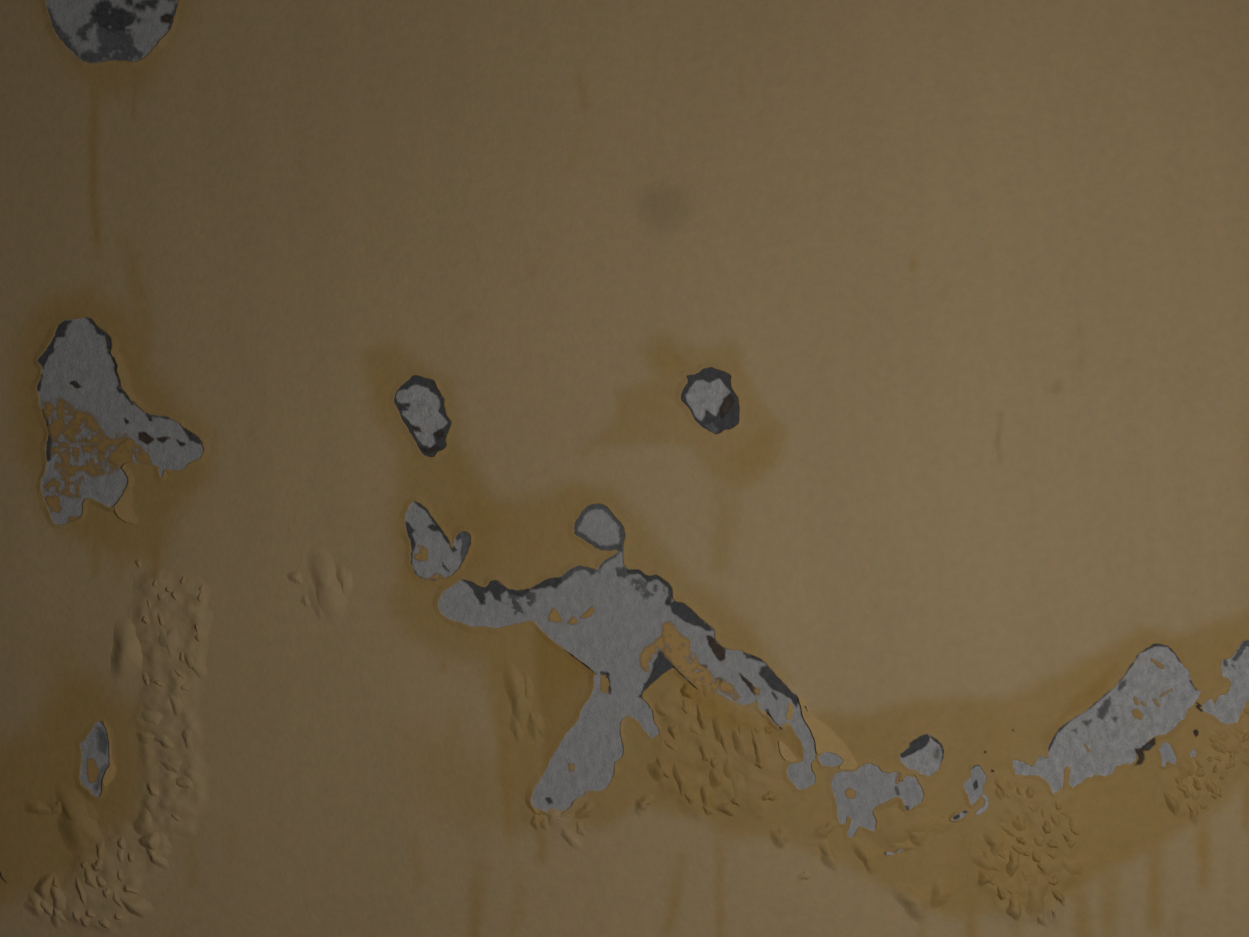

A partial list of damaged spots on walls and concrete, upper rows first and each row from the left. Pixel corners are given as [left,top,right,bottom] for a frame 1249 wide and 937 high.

peeling [399,496,949,842]